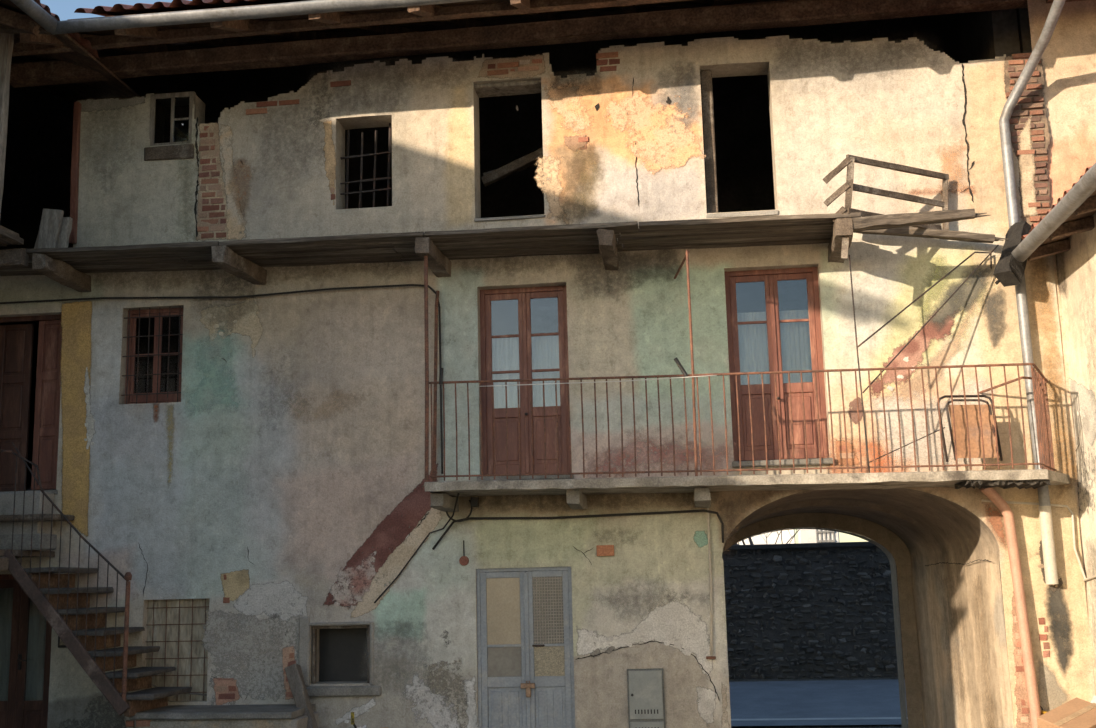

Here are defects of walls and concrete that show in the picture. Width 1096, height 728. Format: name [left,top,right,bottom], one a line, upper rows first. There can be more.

spalling [196,123,247,241]
spalling [478,54,545,79]
peeling [534,155,569,224]
peeling [545,83,594,151]
peeling [605,91,706,175]
crack [960,64,974,203]
flaking render [1006,53,1051,224]
peeling [323,463,442,618]
spalling [202,569,308,705]
peeling [576,600,730,728]
spalling [1012,591,1032,728]
water stain [1046,584,1072,672]